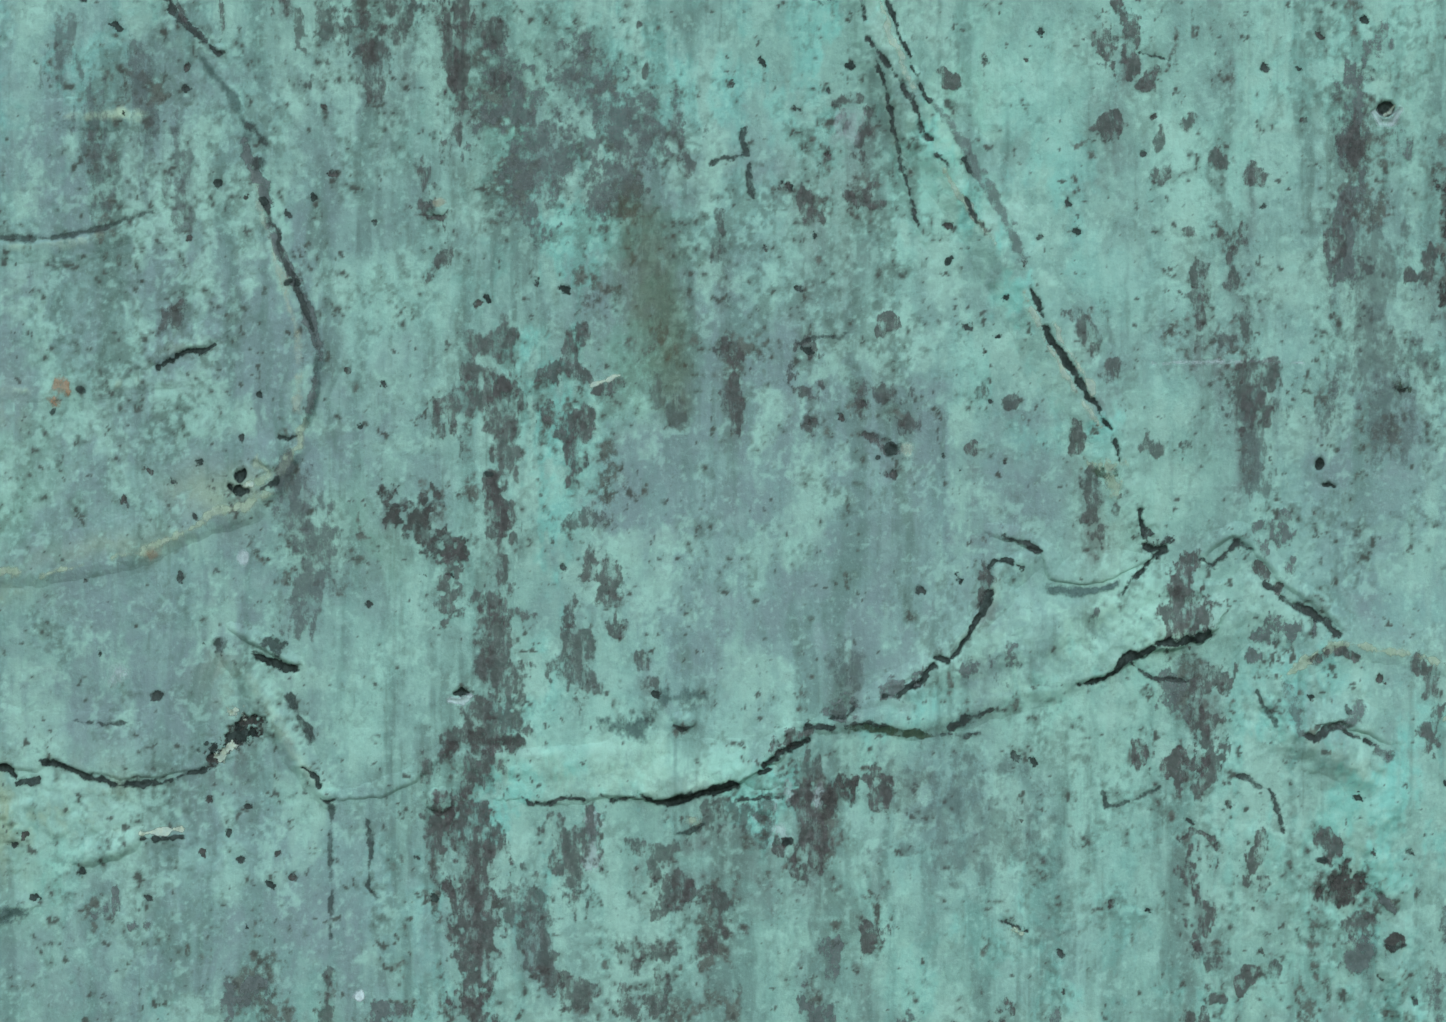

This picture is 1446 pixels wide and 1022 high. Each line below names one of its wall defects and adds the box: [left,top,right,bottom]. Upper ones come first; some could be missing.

crack [166,0,225,50]
crack [0,213,145,242]
crack [861,0,1120,462]
crack [240,121,324,441]
crack [155,343,217,371]
crack [260,475,280,490]
crack [203,637,300,673]
crack [522,508,1361,809]
crack [76,718,126,726]
crack [1304,700,1395,763]
crack [0,758,207,789]
crack [0,907,27,923]